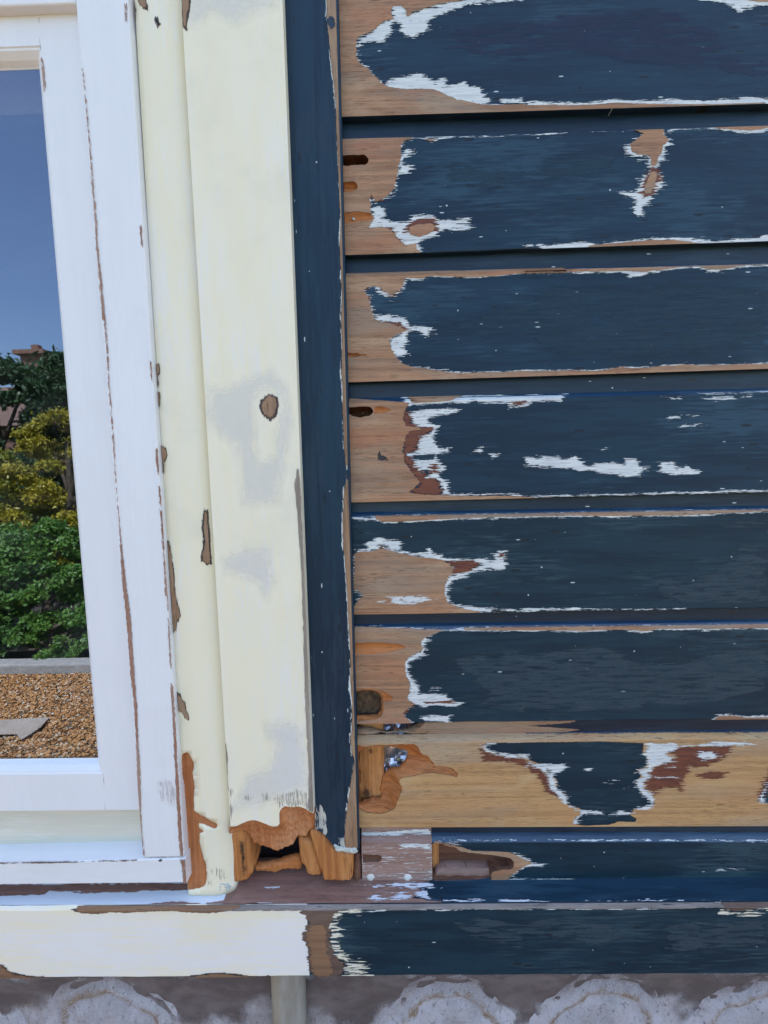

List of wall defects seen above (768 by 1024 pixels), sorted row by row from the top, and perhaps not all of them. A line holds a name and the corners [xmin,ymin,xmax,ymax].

peeling [200,509,212,565]
peeling [325,0,768,880]
peeling [0,683,592,979]
peeling [705,900,768,917]